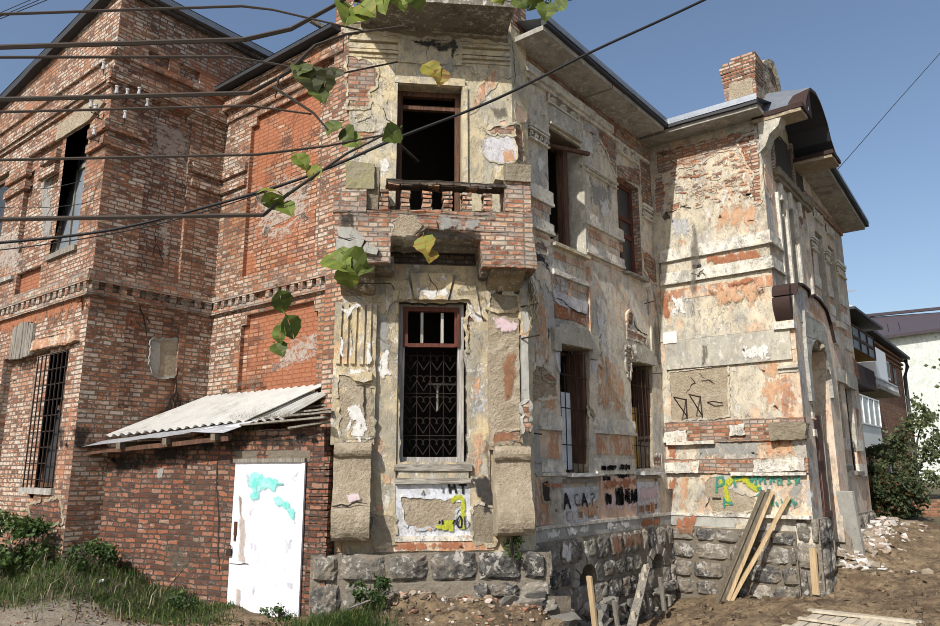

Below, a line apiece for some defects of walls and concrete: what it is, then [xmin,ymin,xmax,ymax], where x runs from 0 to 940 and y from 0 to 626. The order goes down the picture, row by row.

spalling [343,55,384,156]
peeling [470,69,498,115]
peeling [481,101,527,165]
spalling [638,127,774,229]
peeling [709,277,763,307]
spalling [333,342,391,440]
spalling [370,238,595,551]
peeling [755,440,802,457]